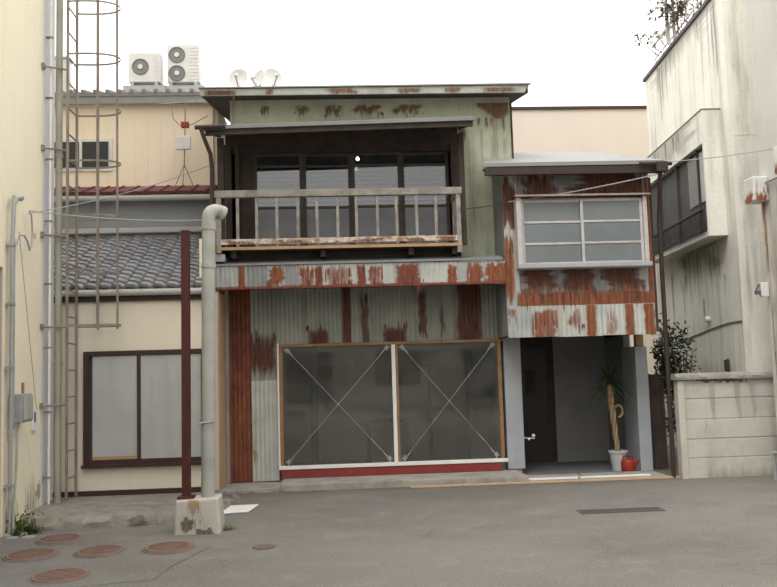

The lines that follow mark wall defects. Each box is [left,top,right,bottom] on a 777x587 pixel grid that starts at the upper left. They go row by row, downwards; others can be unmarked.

rust [354,105,383,118]
rust [394,105,422,117]
rust [477,103,508,130]
rust [216,174,656,344]